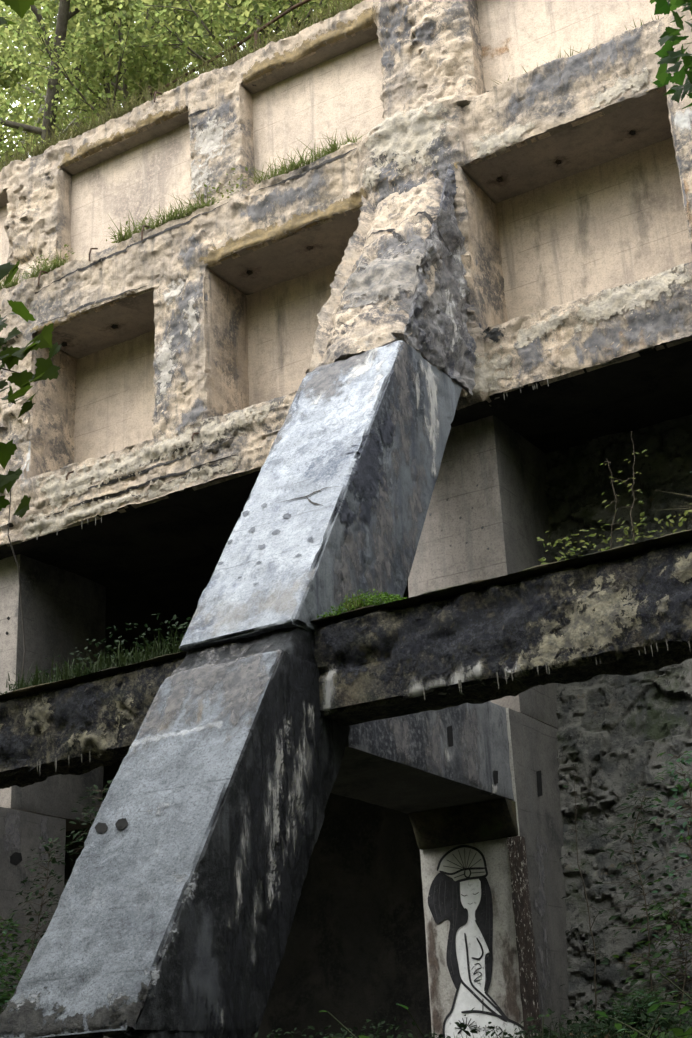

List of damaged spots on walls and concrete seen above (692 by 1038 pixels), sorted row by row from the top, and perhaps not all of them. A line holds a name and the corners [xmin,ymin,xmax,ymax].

water stain [506,27,641,122]
water stain [240,172,325,222]
water stain [369,128,454,209]
water stain [670,102,692,226]
water stain [572,294,685,366]
crack [282,486,339,506]
water stain [129,197,579,1038]
water stain [617,546,692,643]
spalling [0,921,179,1038]